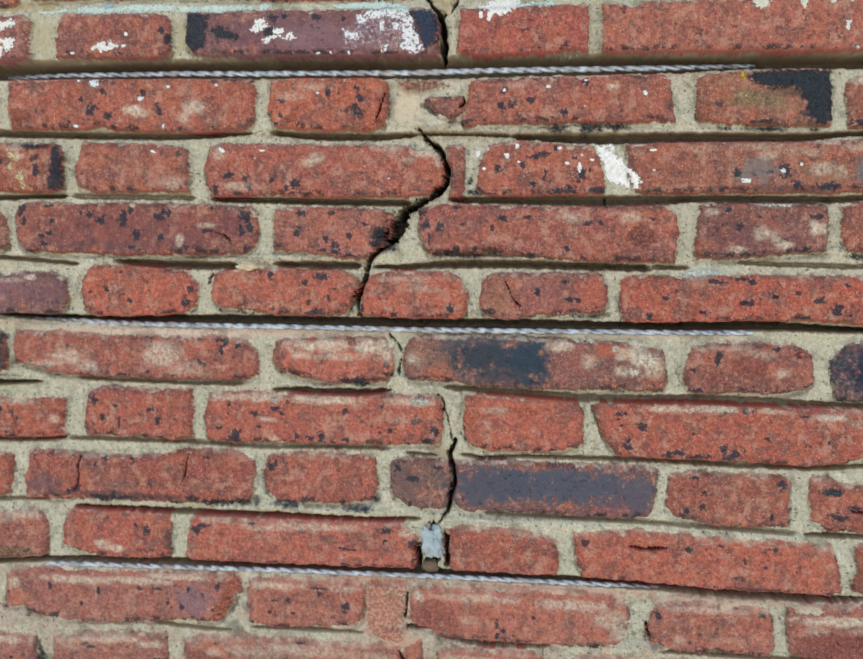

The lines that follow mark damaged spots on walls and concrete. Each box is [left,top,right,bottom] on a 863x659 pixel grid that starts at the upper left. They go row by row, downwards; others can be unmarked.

crack [426,0,459,68]
crack [375,92,386,121]
crack [353,127,451,318]
crack [389,332,402,375]
crack [412,394,458,574]